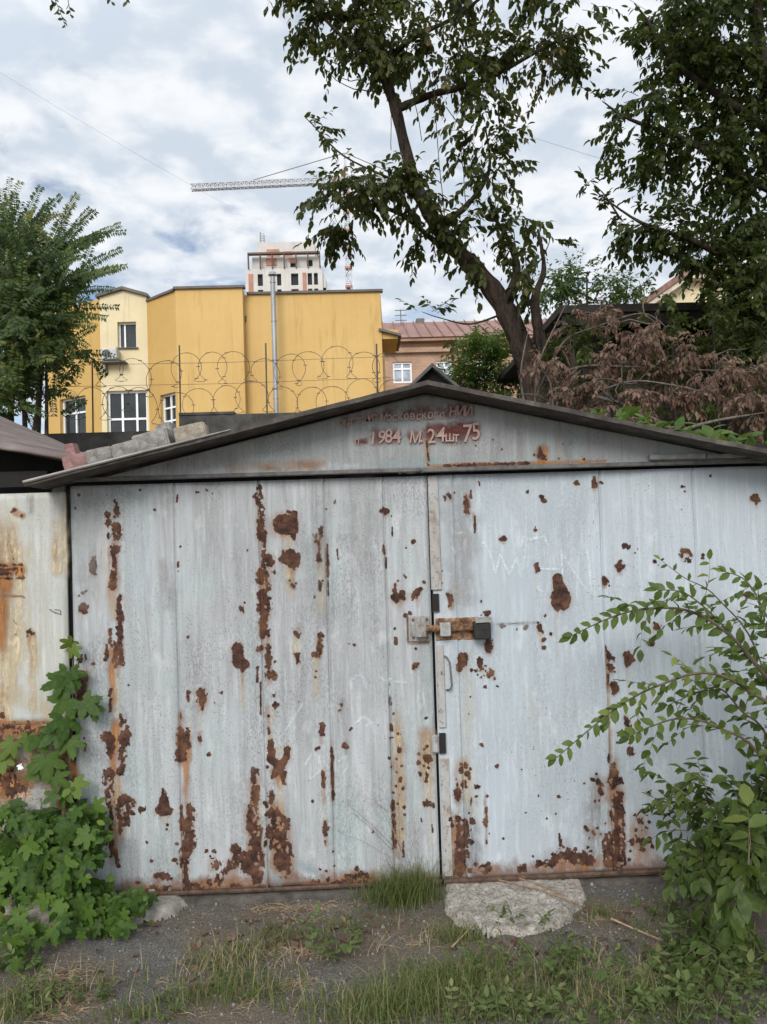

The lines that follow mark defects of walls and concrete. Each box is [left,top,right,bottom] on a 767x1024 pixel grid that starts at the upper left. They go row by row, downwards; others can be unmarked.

rust [425,437,606,472]
rust [0,529,49,724]
rust [76,484,301,891]
rust [291,628,325,689]
rust [390,574,426,618]
rust [455,639,499,689]
rust [537,573,571,650]
rust [605,645,636,695]
rust [308,722,335,801]
rust [416,733,435,833]
rust [448,761,492,877]
rust [517,715,654,873]